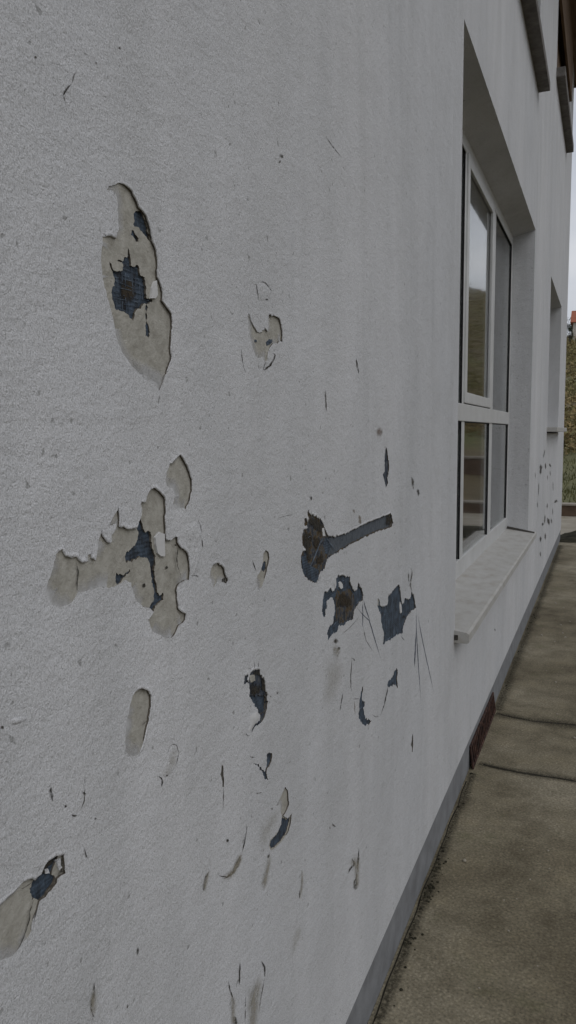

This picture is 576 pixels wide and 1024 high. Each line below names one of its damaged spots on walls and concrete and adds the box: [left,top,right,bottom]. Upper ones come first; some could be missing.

peeling [101,181,174,390]
peeling [241,312,283,372]
peeling [46,452,194,638]
peeling [210,560,229,587]
peeling [301,497,393,655]
peeling [377,574,416,645]
peeling [125,685,153,756]
peeling [244,662,278,735]
peeling [358,668,398,726]
peeling [264,787,292,883]
peeling [0,849,67,960]